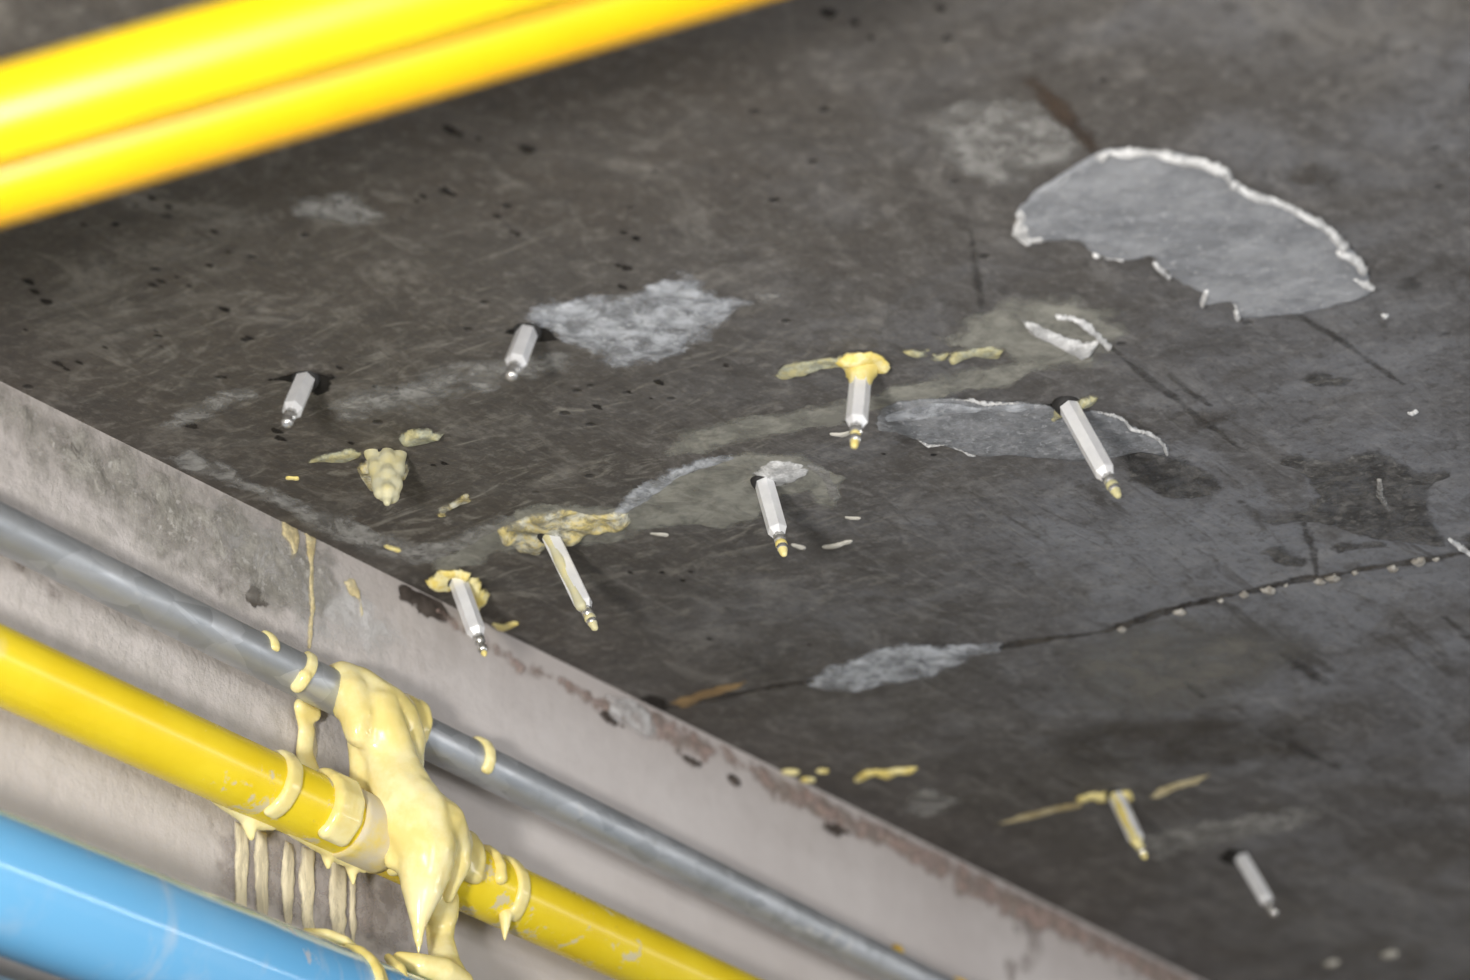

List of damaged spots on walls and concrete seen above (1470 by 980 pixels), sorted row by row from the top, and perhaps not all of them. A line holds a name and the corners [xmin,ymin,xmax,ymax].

peeling [1012,147,1376,322]
peeling [949,301,1125,370]
peeling [876,398,1086,461]
peeling [1083,410,1221,499]
crack [904,523,1470,669]
corrosion [671,682,744,708]
crack [666,679,836,708]
crack [1291,661,1318,680]